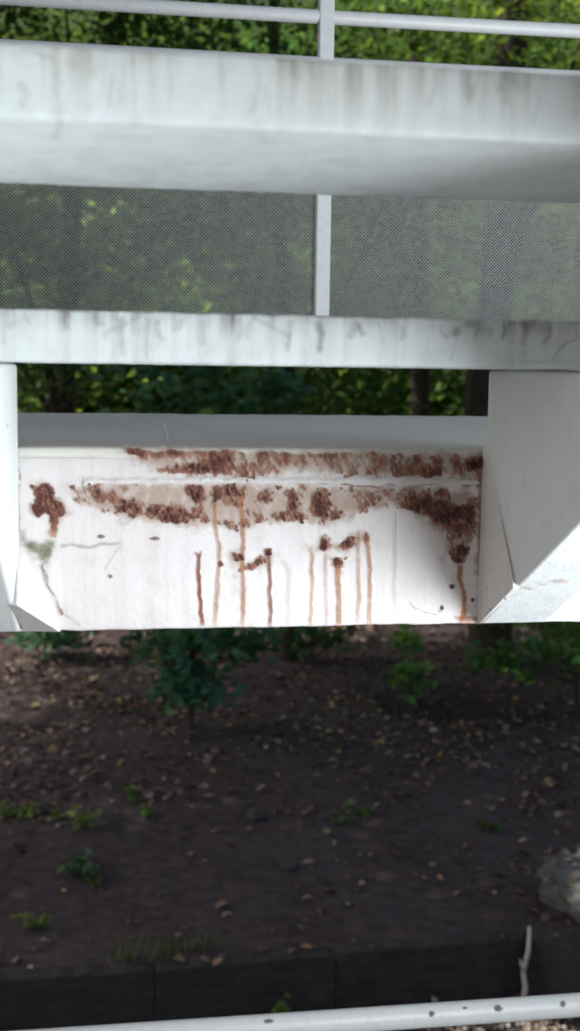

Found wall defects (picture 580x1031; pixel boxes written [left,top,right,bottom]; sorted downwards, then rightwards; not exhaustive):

corrosion [30,483,65,531]
crack [42,565,63,615]
corrosion [197,495,273,624]
corrosion [310,533,372,625]
corrosion [449,566,475,621]